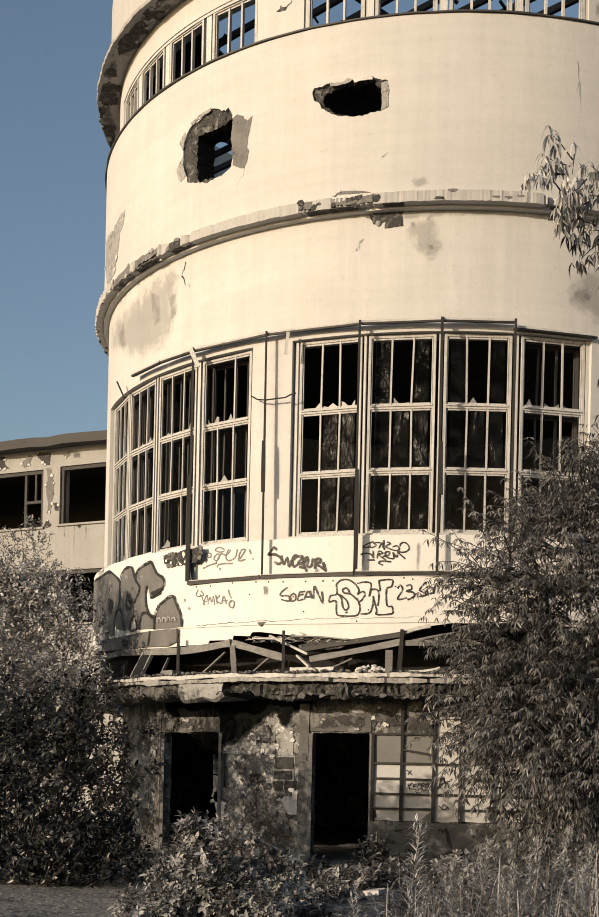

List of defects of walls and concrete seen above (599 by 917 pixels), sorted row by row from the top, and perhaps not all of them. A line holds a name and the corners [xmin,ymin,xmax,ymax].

peeling [330,77,389,110]
peeling [176,132,186,182]
peeling [231,114,253,168]
peeling [297,190,405,228]
peeling [100,211,180,306]
peeling [20,452,59,528]
flaking render [224,726,298,815]
peeling [210,775,247,829]